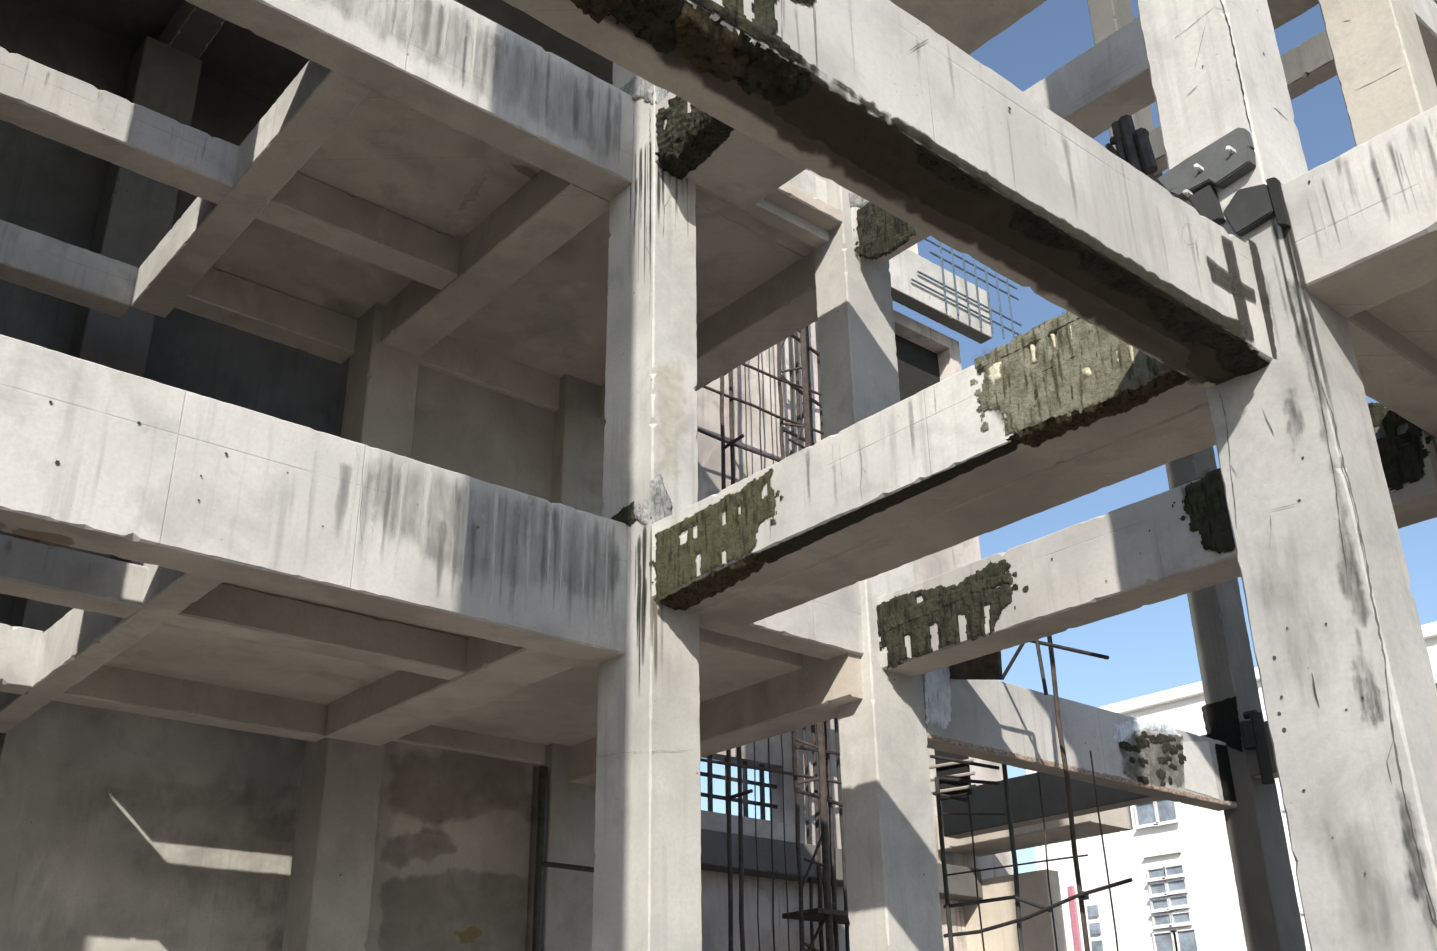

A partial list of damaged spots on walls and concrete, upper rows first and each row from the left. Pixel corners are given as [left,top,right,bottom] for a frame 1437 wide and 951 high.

leakage [683,0,735,37]
leakage [604,13,1277,385]
spalling [915,145,991,199]
spalling [1008,202,1270,376]
leakage [1272,211,1330,395]